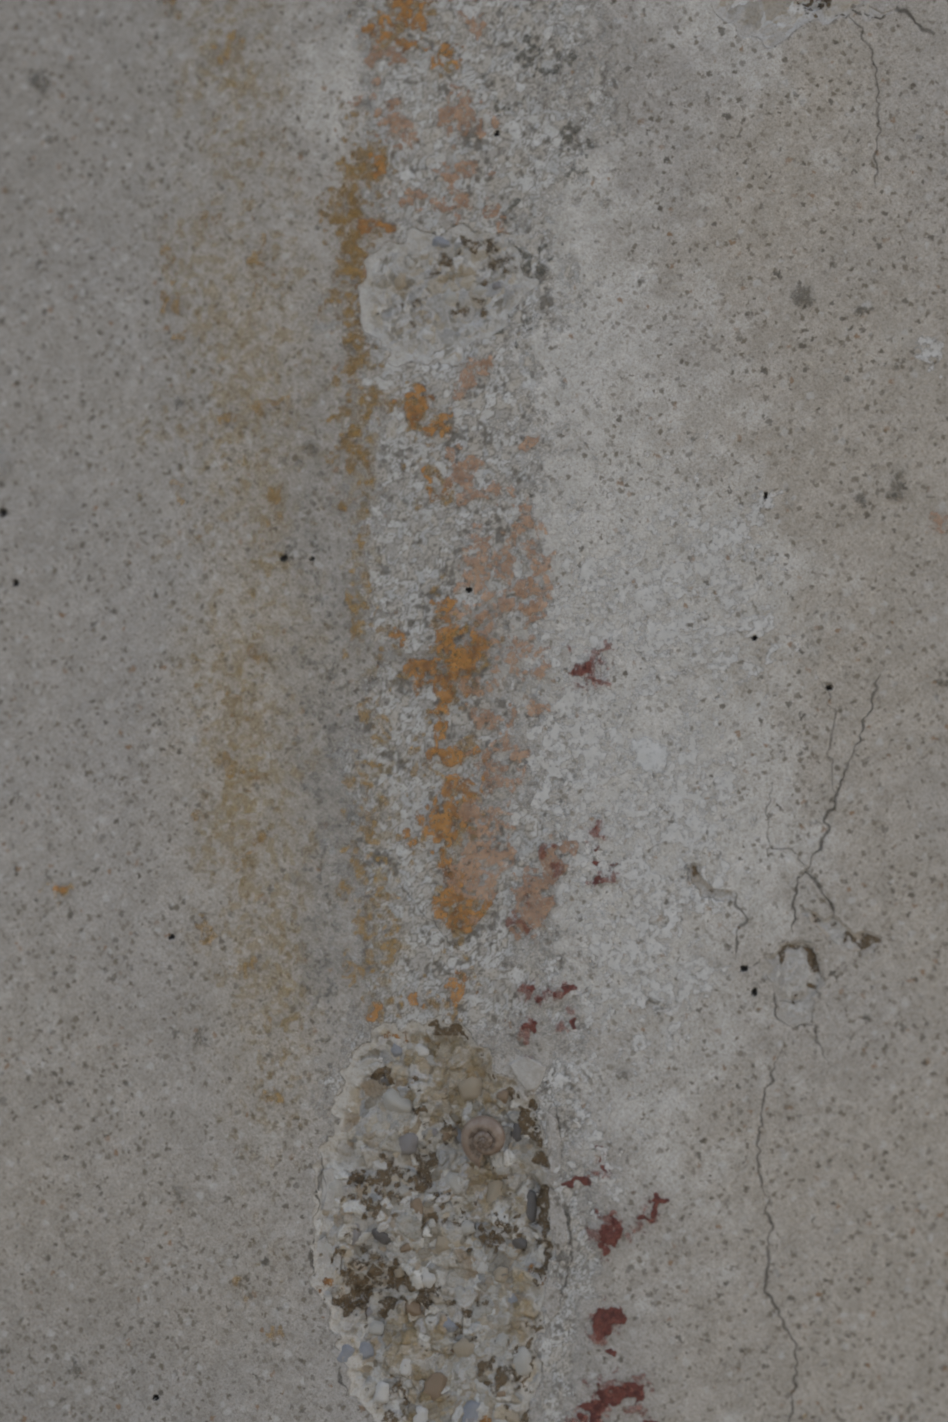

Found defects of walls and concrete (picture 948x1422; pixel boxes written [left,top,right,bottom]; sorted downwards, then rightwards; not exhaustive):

spalling [709,0,901,49]
corrosion [316,0,556,1024]
spalling [309,0,669,1422]
corrosion [505,834,579,941]
crack [791,675,880,934]
crack [756,1057,798,1422]